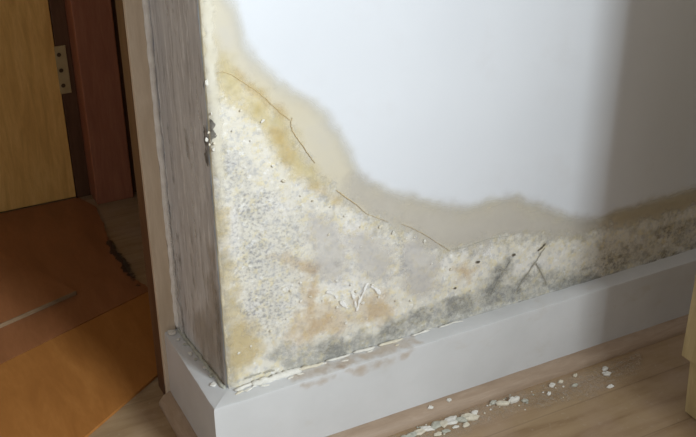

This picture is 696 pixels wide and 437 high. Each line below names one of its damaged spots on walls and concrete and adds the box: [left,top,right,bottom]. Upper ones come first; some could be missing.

crack [218,71,315,163]
peeling [149,0,696,395]
water stain [205,0,696,257]
crack [518,243,547,289]